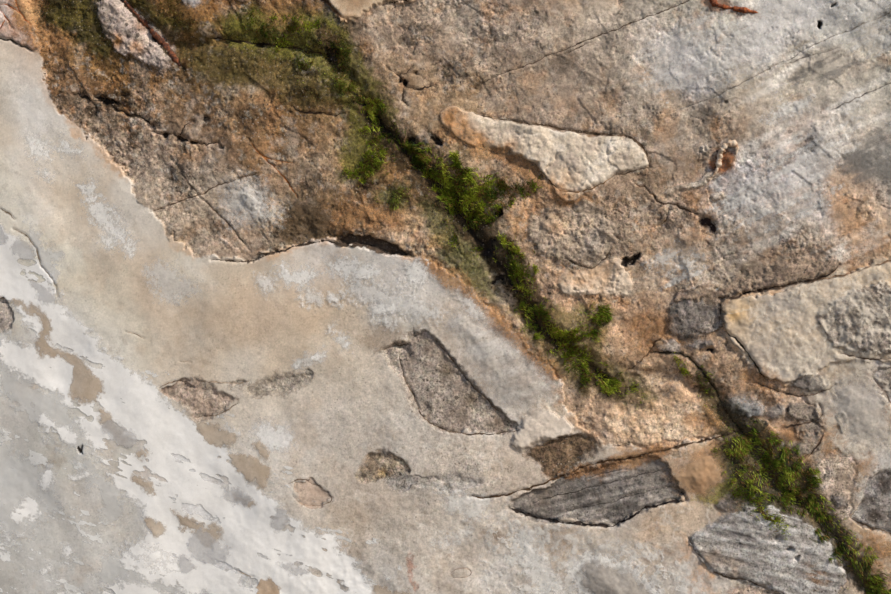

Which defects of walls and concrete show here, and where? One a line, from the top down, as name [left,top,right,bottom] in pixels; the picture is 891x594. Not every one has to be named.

rust [124,1,181,66]
crack [484,0,689,83]
crack [673,11,891,112]
crack [73,93,218,146]
flaking render [440,106,648,202]
crack [0,208,57,292]
crack [154,144,413,263]
flaking render [559,257,633,296]
flaking render [722,259,891,403]
peeling [0,225,375,594]
spalling [384,330,684,526]
spalling [814,449,891,535]